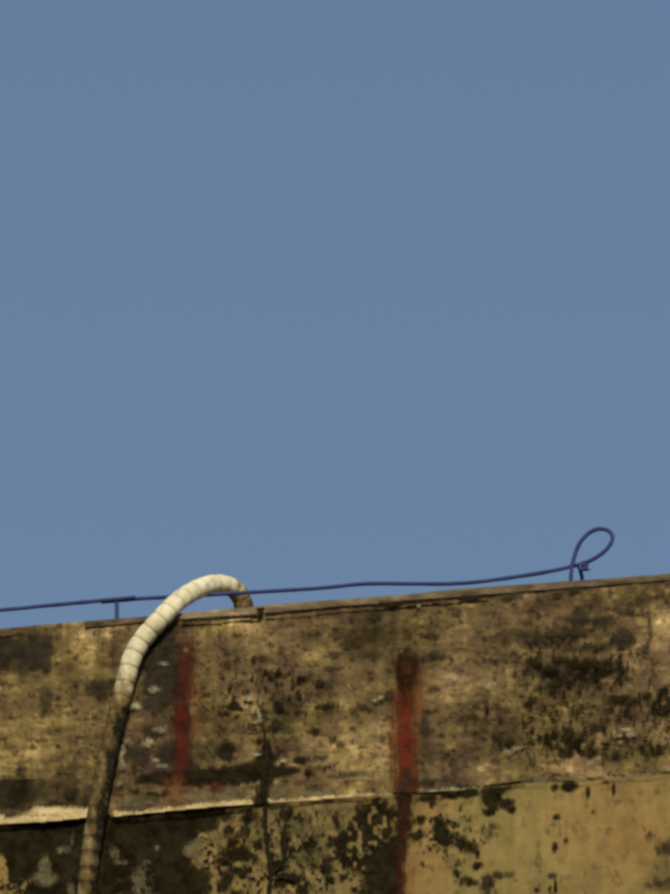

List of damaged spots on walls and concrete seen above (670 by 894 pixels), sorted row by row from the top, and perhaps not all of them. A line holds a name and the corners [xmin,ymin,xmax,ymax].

damp [86,678,113,696]
damp [468,591,670,768]
damp [0,765,87,894]
damp [97,630,524,894]
damp [551,782,590,797]